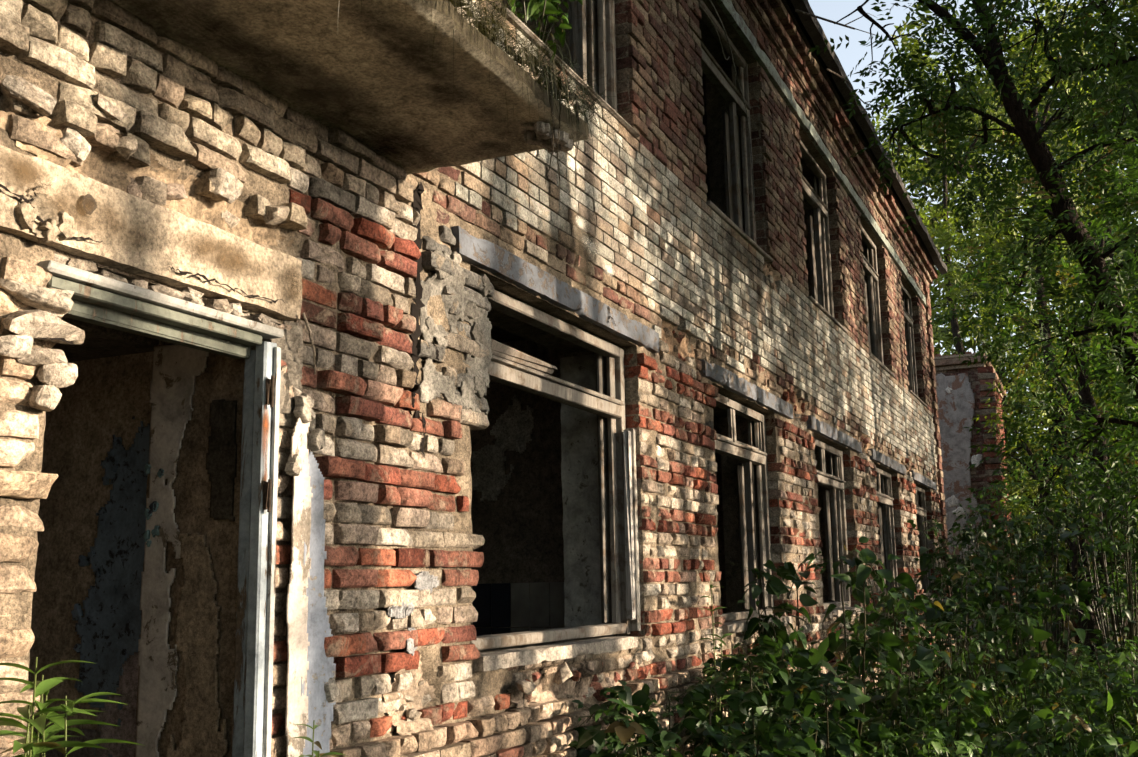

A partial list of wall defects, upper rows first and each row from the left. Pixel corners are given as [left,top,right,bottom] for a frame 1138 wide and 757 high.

crack [0,183,103,243]
crack [167,266,285,303]
crack [403,182,439,458]
flaking render [419,249,534,502]
flaking render [39,343,244,757]
flaking render [270,319,339,757]